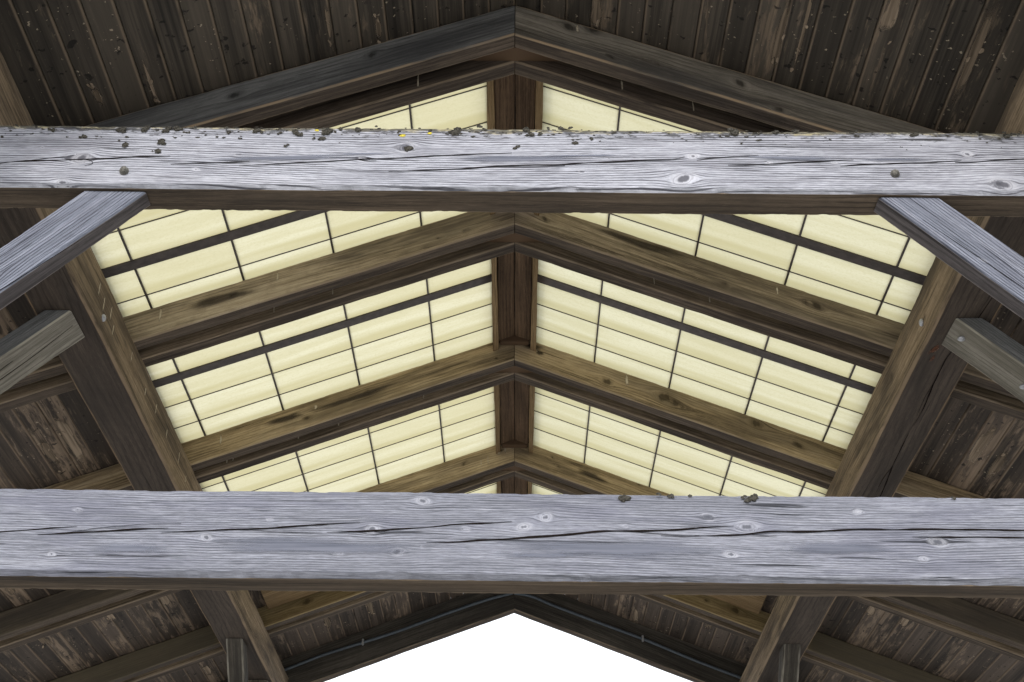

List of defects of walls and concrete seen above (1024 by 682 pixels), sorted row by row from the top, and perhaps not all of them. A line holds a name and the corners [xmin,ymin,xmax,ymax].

crack [2,153,1024,172]
crack [0,521,1024,543]